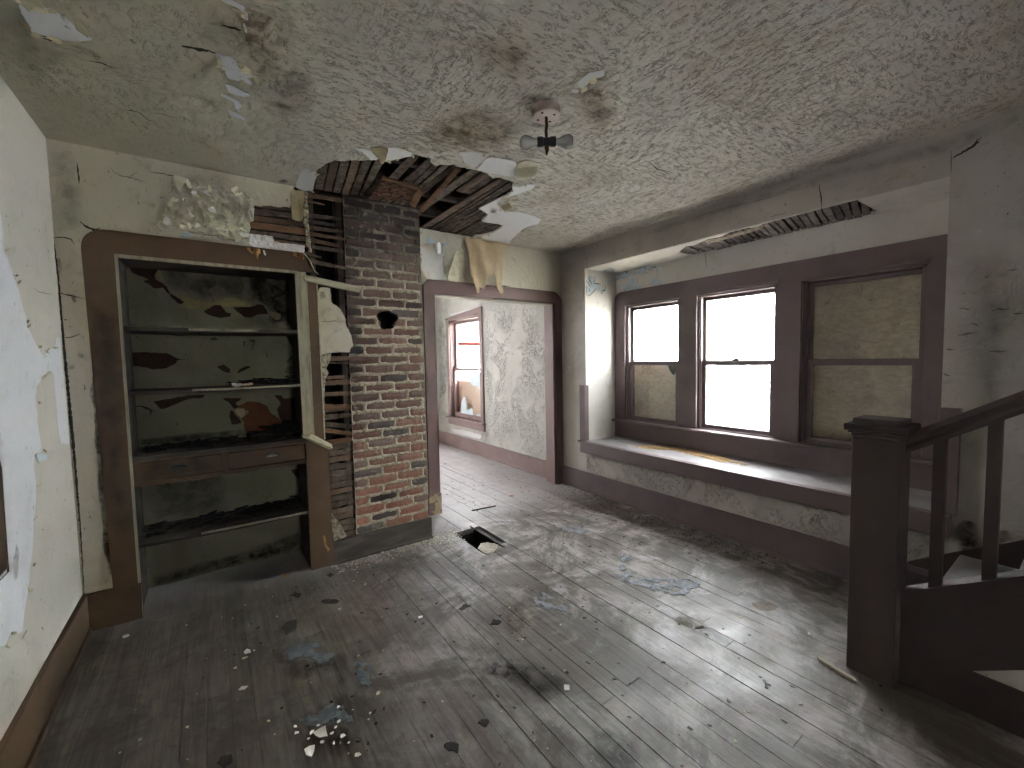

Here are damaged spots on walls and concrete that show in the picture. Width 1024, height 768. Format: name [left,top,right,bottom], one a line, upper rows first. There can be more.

peeling [15,0,100,60]
crack [181,45,216,54]
peeling [215,53,263,120]
peeling [355,147,415,164]
crack [950,137,981,175]
peeling [459,152,542,244]
peeling [0,213,113,648]